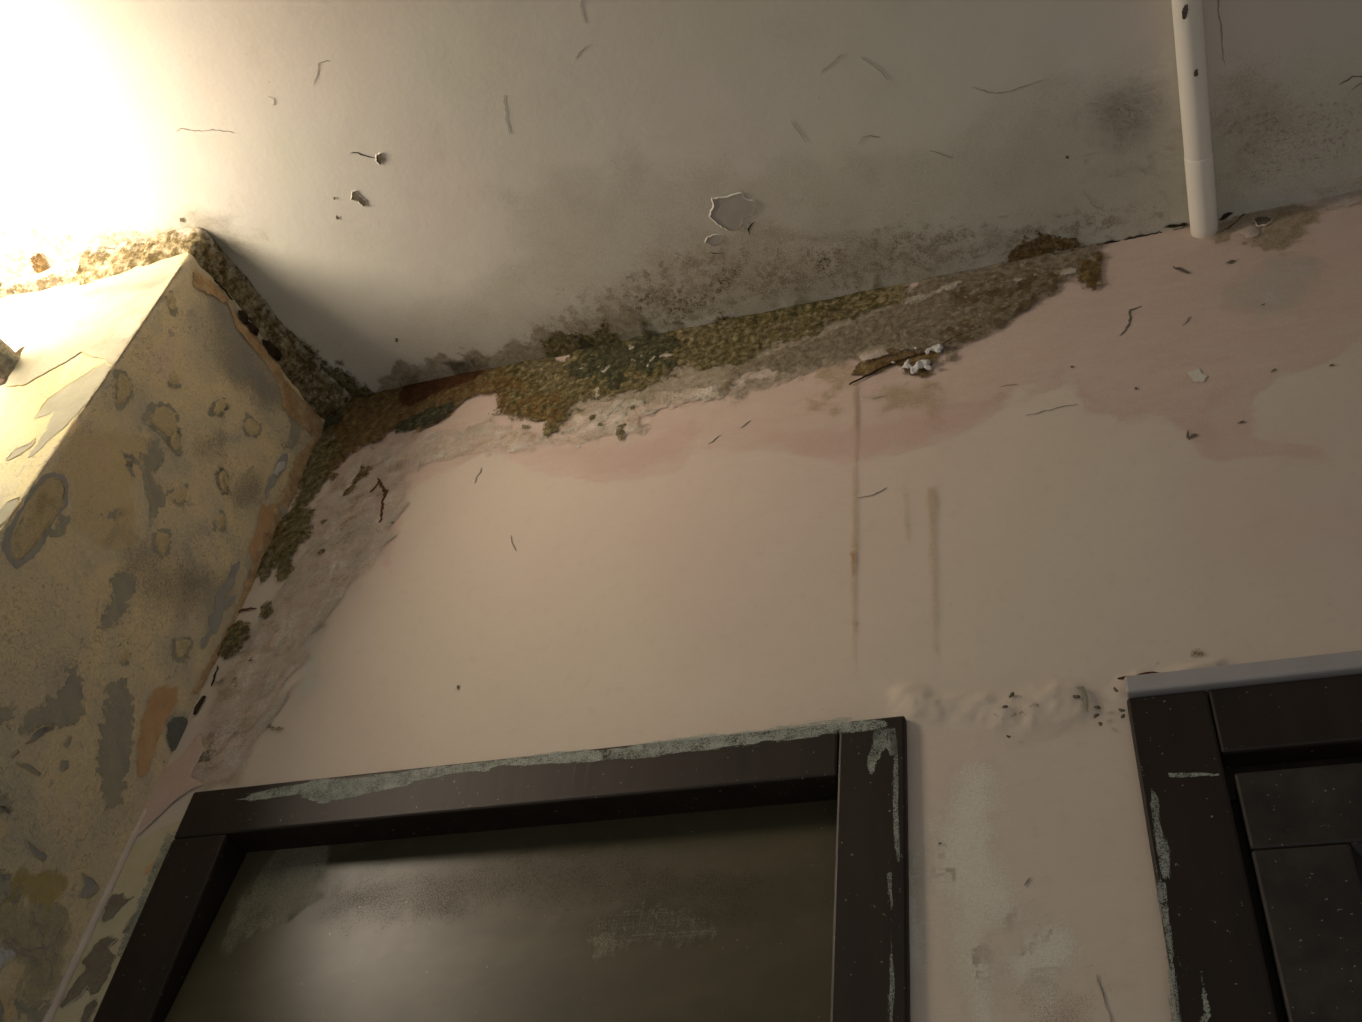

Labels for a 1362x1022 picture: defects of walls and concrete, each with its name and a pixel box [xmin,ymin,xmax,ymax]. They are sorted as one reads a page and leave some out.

peeling [333,190,368,220]
peeling [546,360,783,442]
damp [0,32,1362,583]
peeling [704,192,757,254]
spalling [803,322,989,437]
damp [105,530,274,715]
peeling [0,264,410,809]
peeling [0,820,182,1022]